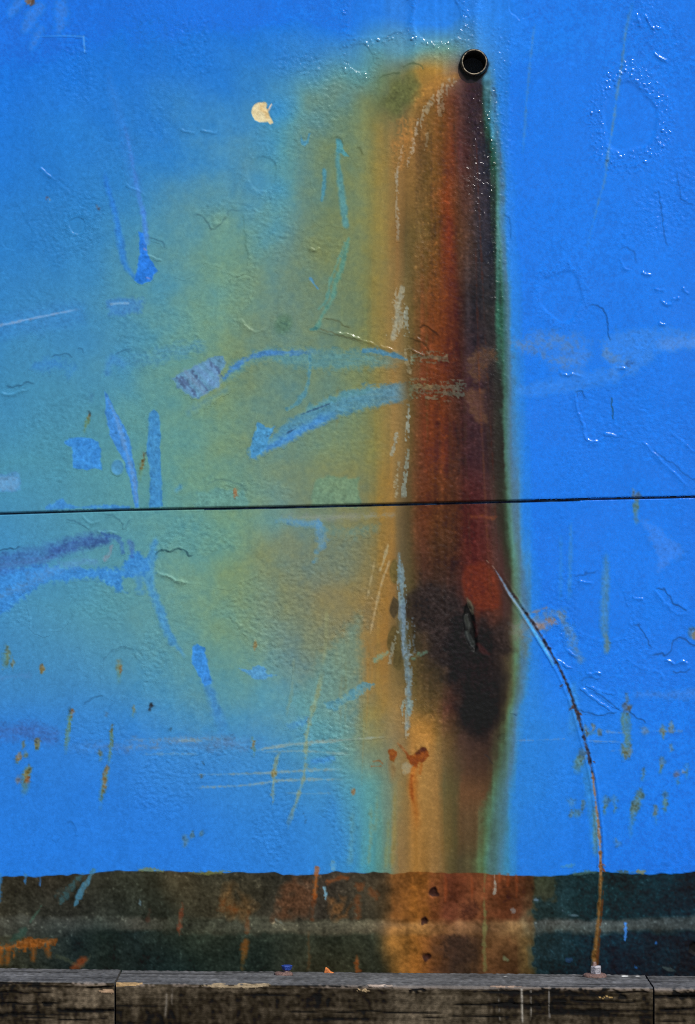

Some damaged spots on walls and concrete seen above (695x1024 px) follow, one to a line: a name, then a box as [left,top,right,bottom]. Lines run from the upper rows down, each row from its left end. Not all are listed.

corrosion [585,0,695,256]
corrosion [542,625,695,712]
corrosion [19,762,34,797]
corrosion [358,783,399,870]
corrosion [403,745,430,832]
corrosion [566,710,581,737]
corrosion [571,745,587,776]
corrosion [578,692,695,876]
corrosion [0,926,92,969]
corrosion [269,873,313,925]
corrosion [324,871,559,974]
corrosion [589,850,604,972]